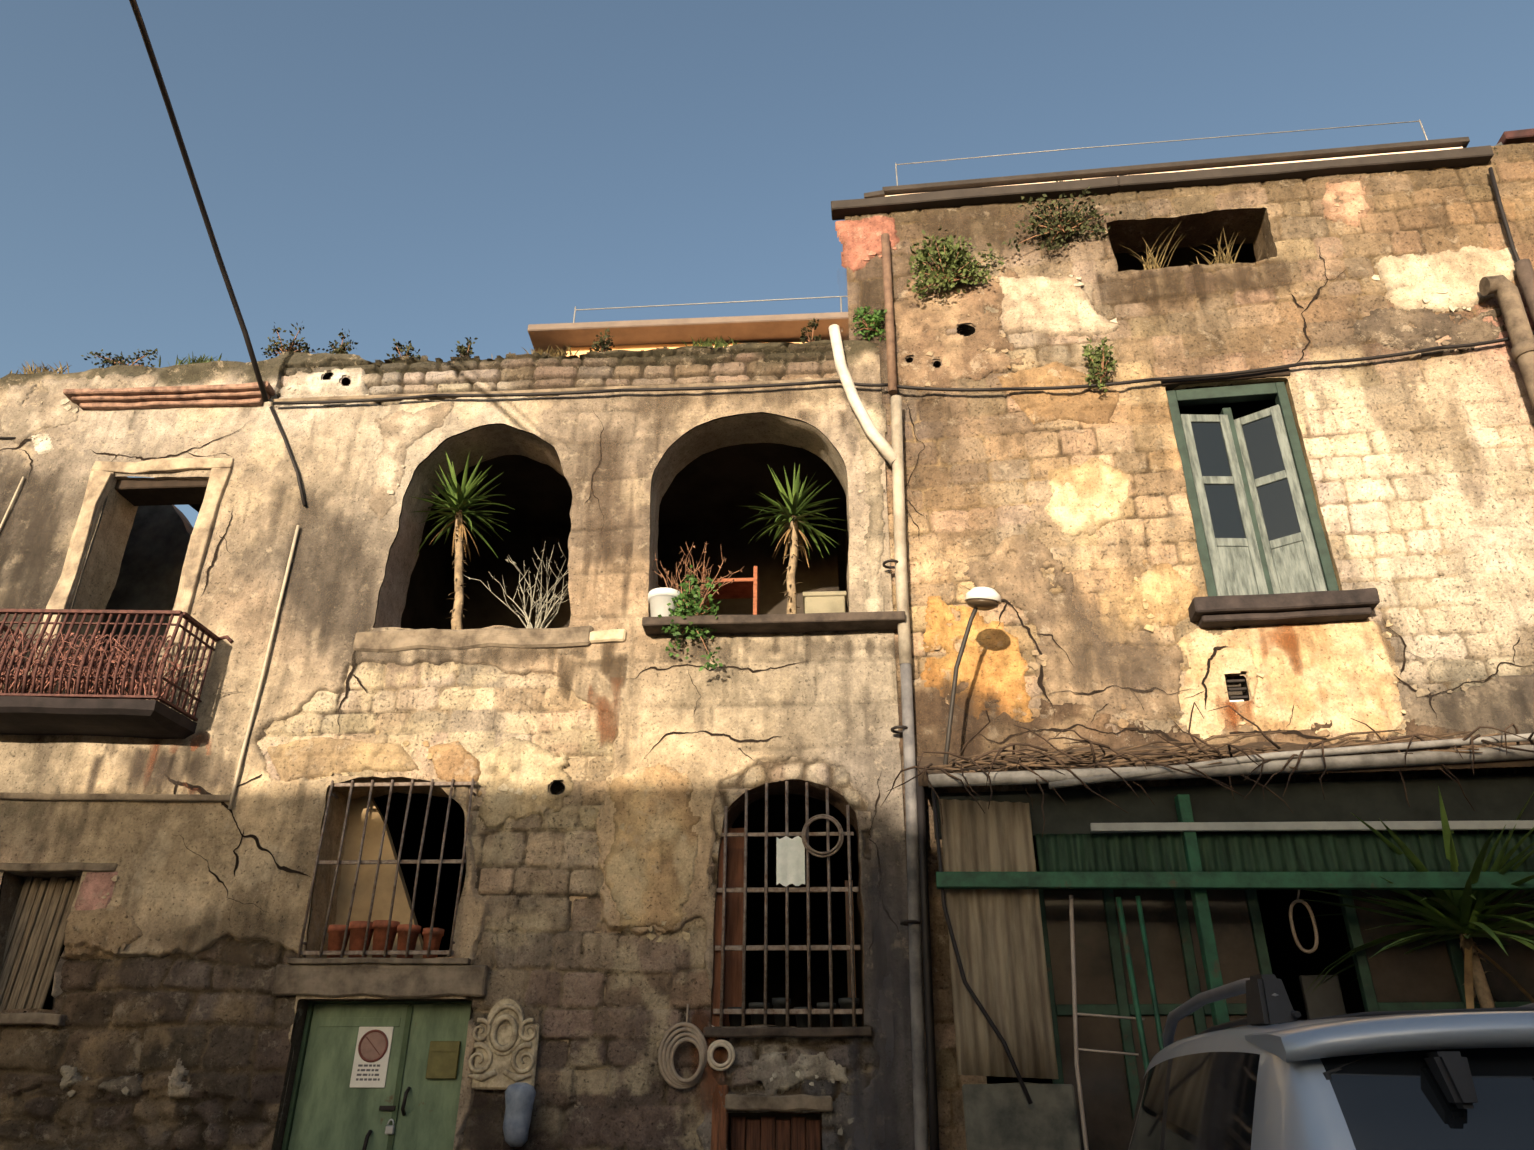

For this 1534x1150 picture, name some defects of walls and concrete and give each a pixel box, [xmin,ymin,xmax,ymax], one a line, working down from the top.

peeling [893,266,1120,394]
peeling [1347,245,1521,364]
crack [90,421,249,462]
crack [201,506,234,596]
crack [337,650,367,738]
crack [628,660,813,761]
damp [917,682,1020,757]
crack [954,580,1369,746]
peeling [74,872,118,910]
crack [146,763,310,925]
peeling [257,662,880,1150]
peeling [0,935,306,1150]